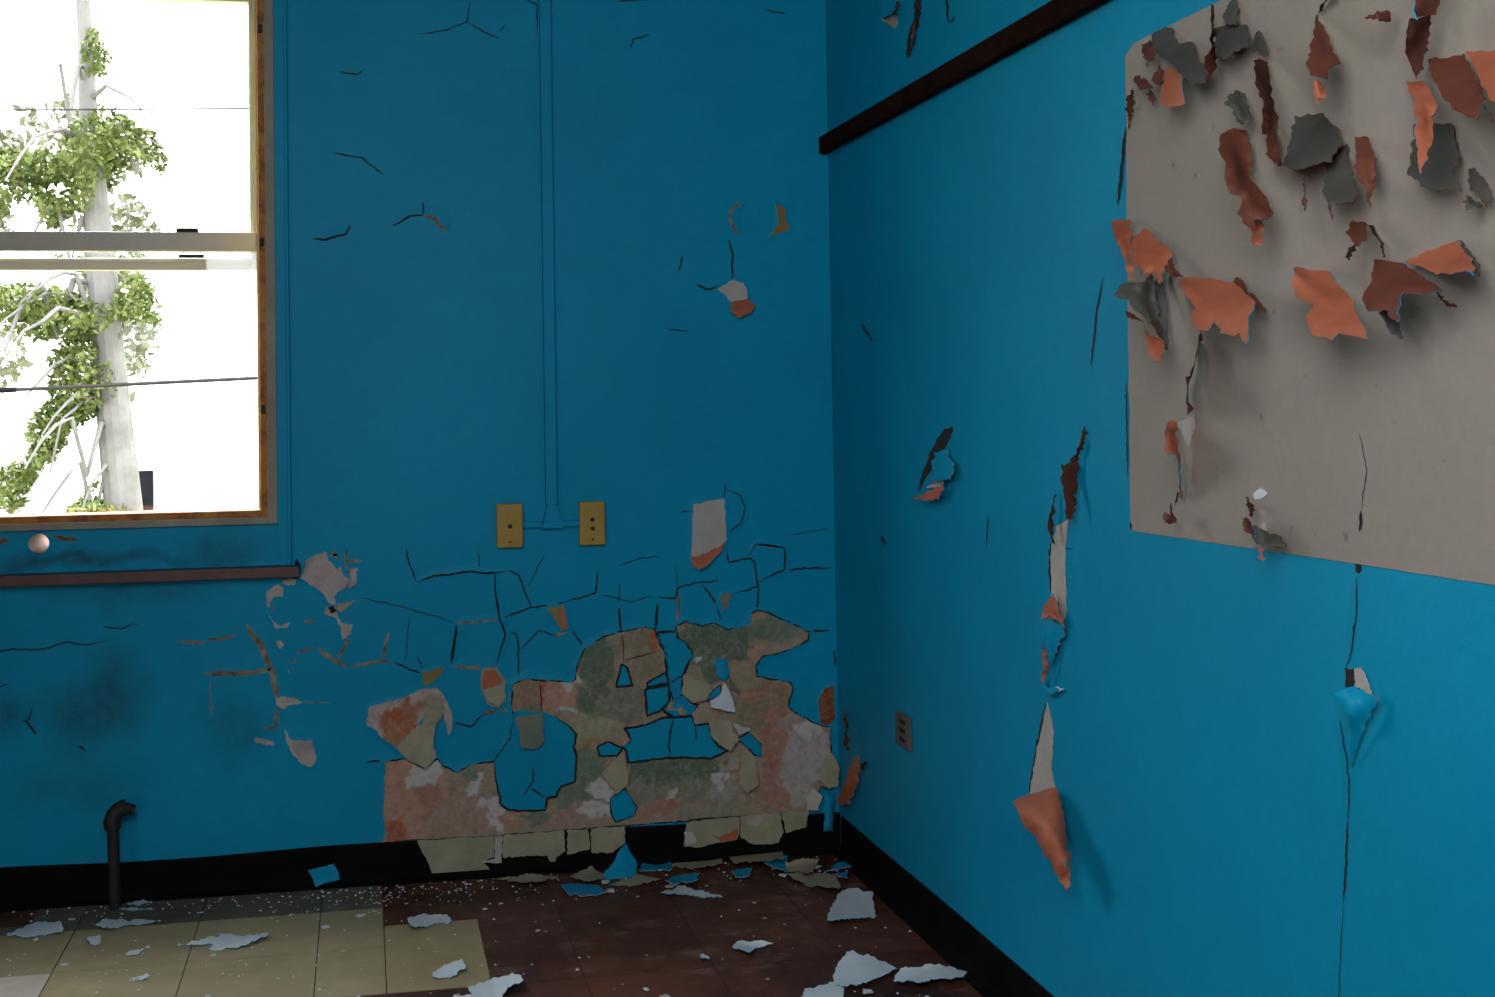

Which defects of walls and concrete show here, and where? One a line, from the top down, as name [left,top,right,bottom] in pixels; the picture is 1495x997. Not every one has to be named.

crack [424,0,538,38]
crack [312,224,350,241]
crack [391,203,452,232]
peeling [697,240,755,318]
peeling [681,482,750,573]
peeling [1111,0,1495,997]
crack [349,528,830,675]
crack [0,623,138,735]
flaking render [177,549,362,771]
crack [455,708,507,728]
peeling [361,590,867,898]
peeling [1013,426,1088,890]